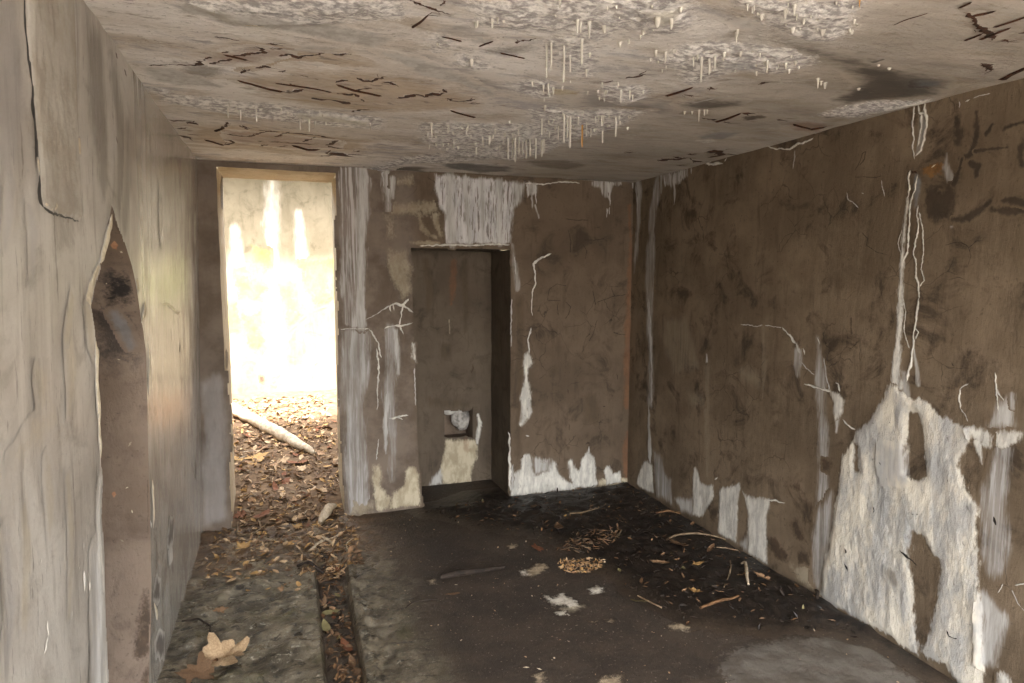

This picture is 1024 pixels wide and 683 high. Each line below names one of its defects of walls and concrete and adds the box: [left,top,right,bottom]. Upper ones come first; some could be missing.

crack [23,0,79,222]
leakage [85,9,134,245]
leakage [134,0,960,531]
leakage [635,108,1024,683]
leakage [128,585,150,683]